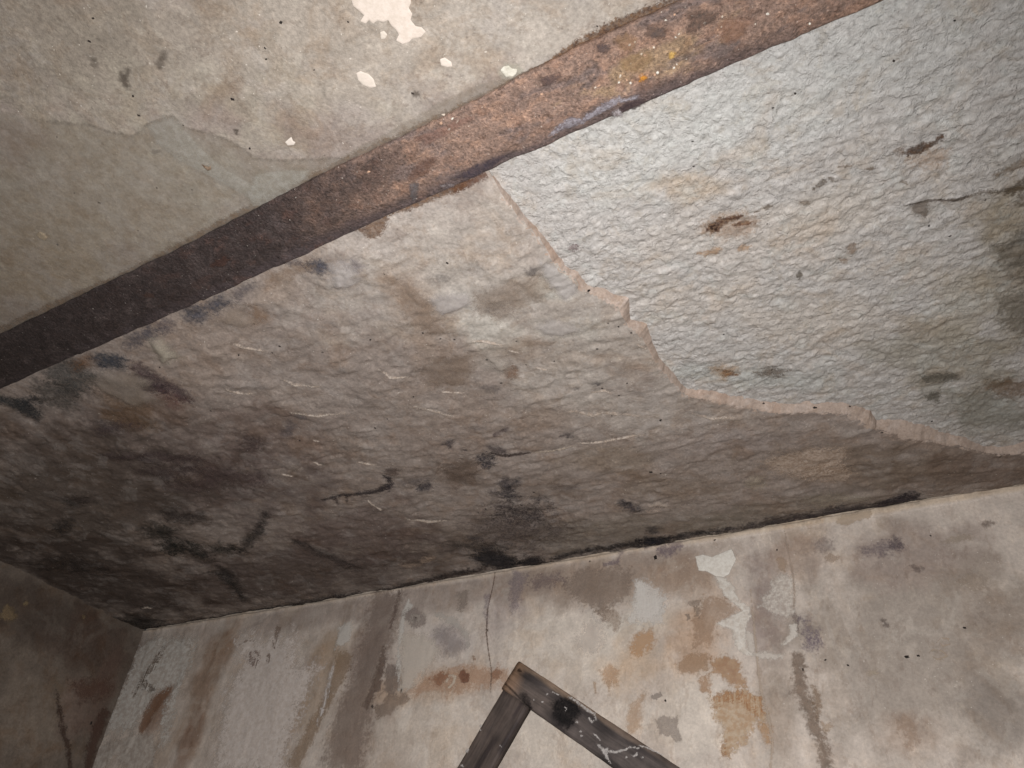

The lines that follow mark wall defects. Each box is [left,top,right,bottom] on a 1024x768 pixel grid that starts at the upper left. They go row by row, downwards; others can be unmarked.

peeling [352,0,426,44]
corrosion [545,0,677,63]
corrosion [0,79,510,333]
corrosion [706,215,752,233]
mould [0,353,190,421]
mould [922,373,958,404]
peeling [836,511,872,525]
water stain [72,566,362,768]
crack [486,577,495,686]
water stain [364,444,919,716]
peeling [696,543,798,768]
water stain [792,614,832,768]